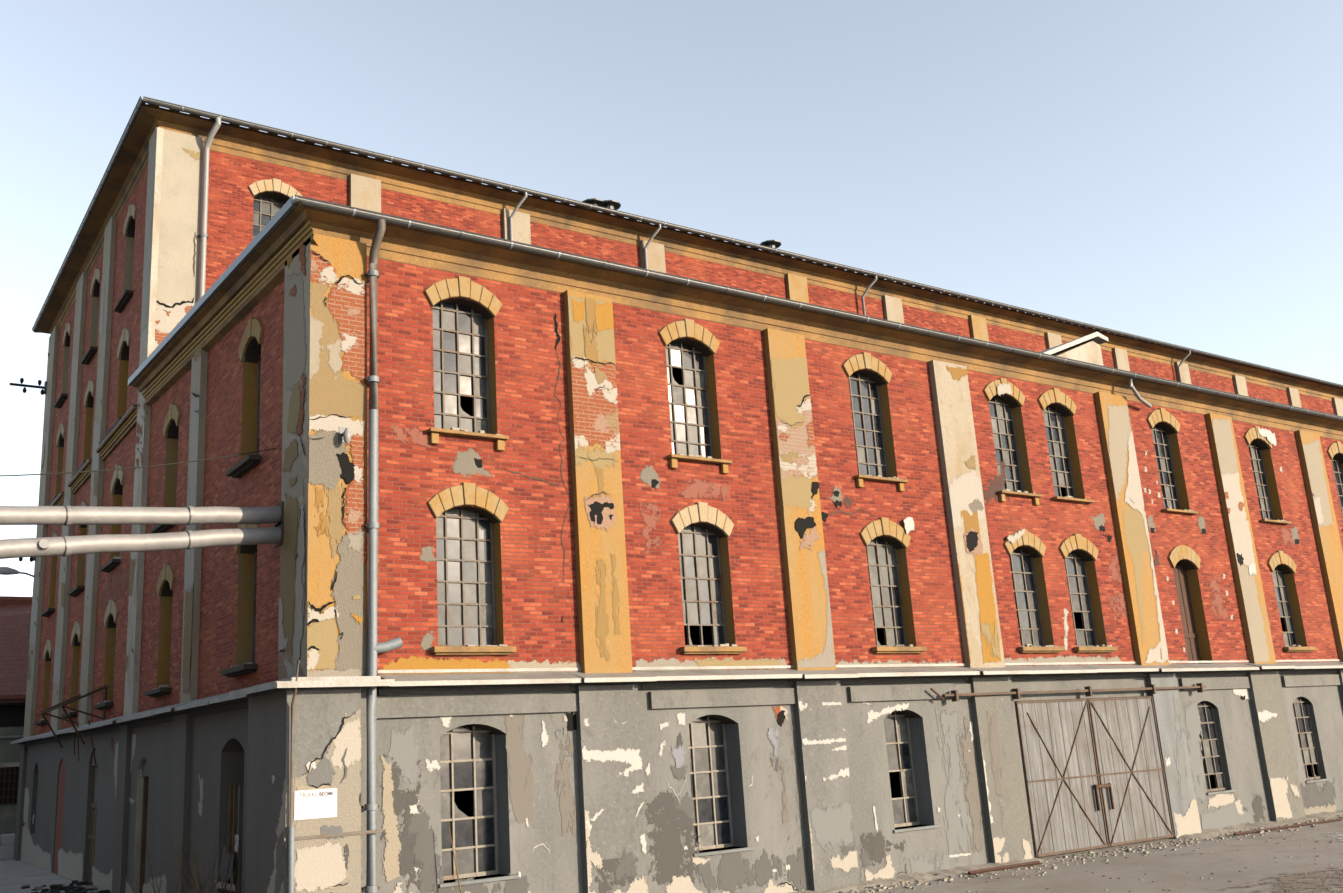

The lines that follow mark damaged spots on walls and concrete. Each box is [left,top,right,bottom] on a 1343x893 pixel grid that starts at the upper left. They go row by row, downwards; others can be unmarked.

peeling [278,240,368,680]
flaking render [568,295,619,449]
spalling [584,495,616,532]
peeling [771,356,843,539]
peeling [1091,404,1185,663]
peeling [1212,418,1269,662]
peeling [21,787,167,893]
spalling [267,709,361,893]
peeling [380,755,419,893]
peeling [585,809,604,893]
peeling [582,712,686,794]
peeling [614,845,710,893]